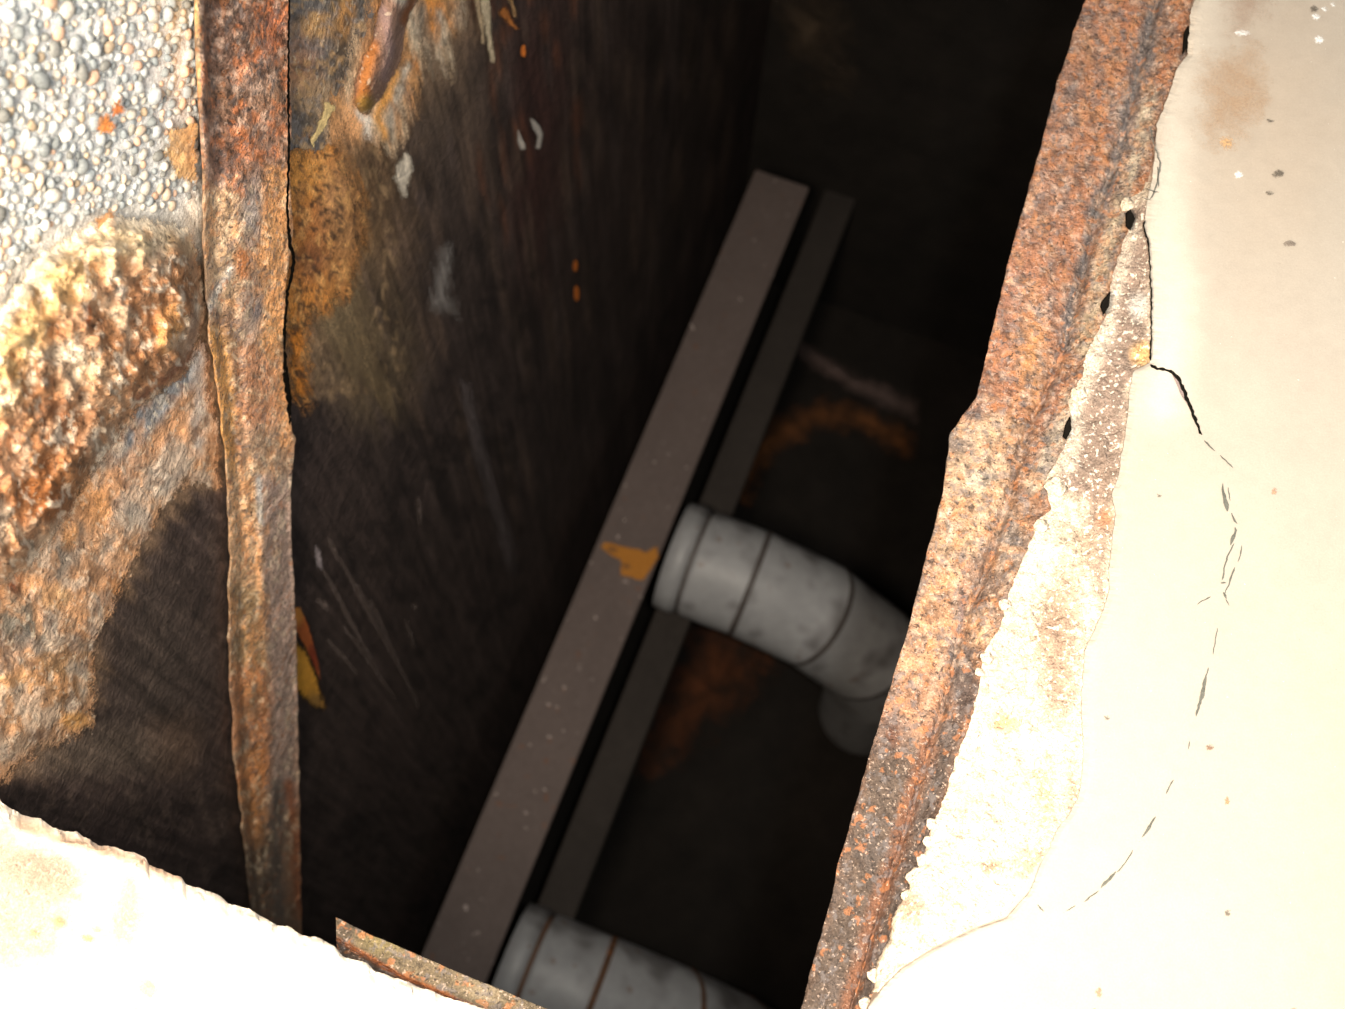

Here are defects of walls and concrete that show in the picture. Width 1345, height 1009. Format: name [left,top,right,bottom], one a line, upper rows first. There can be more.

rust [95,208,114,229]
rust [164,123,199,183]
crack [282,0,296,425]
rust [285,0,519,410]
rust [0,339,224,785]
rust [295,607,326,711]
rust [601,542,659,581]
spalling [859,182,1151,1009]
crack [1038,780,1173,911]
crack [1143,126,1242,749]